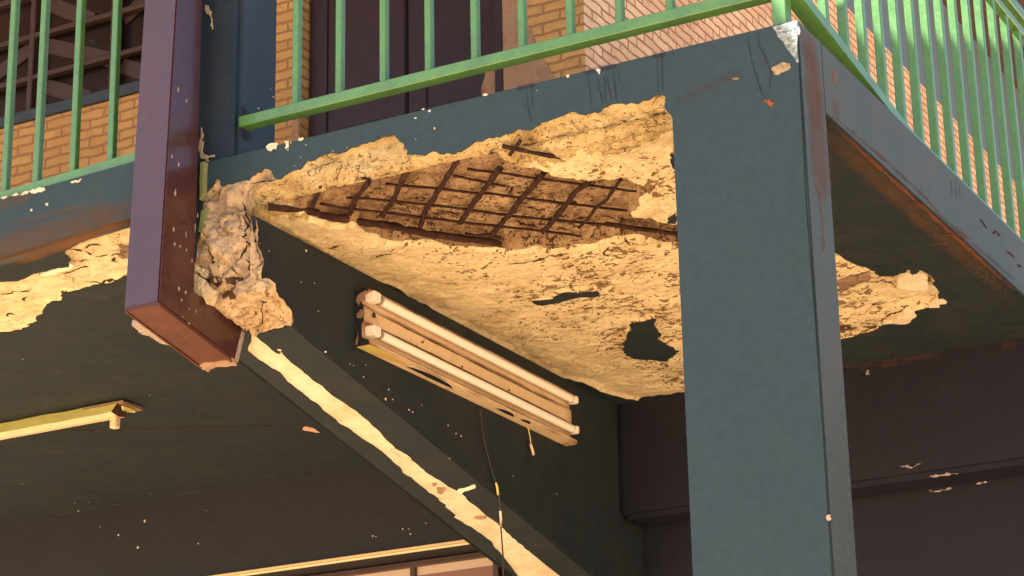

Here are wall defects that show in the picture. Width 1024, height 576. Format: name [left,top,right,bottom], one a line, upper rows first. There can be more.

flaking render [0,228,130,332]
spalling [173,95,685,576]
spalling [835,253,947,339]